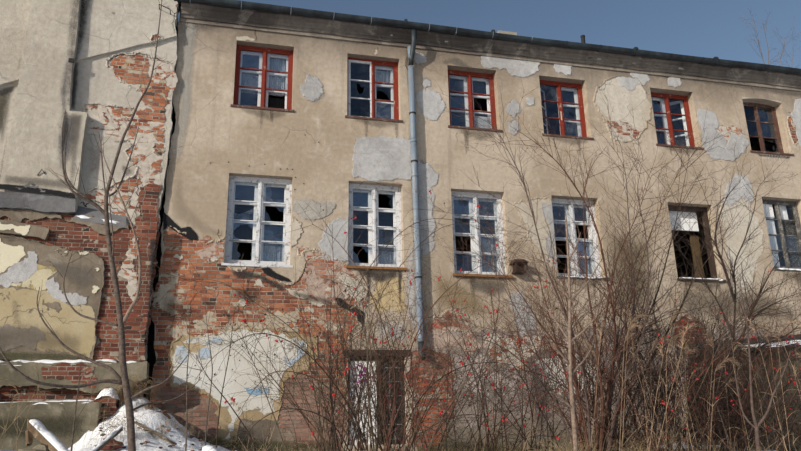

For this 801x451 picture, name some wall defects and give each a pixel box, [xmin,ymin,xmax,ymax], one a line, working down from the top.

damp [59,0,89,169]
flaking render [592,74,652,144]
spalling [786,116,800,146]
flaking render [0,235,105,388]
flaking render [79,23,415,451]
flaking render [512,196,558,270]
flaking render [403,308,781,451]
flaking render [719,198,764,305]